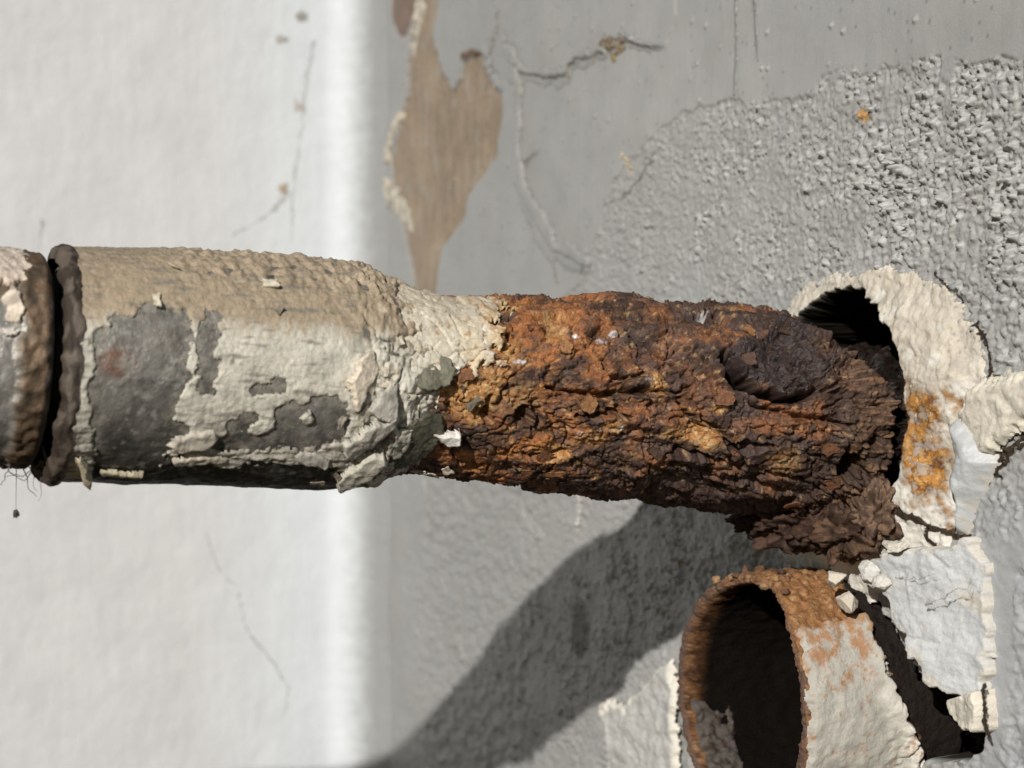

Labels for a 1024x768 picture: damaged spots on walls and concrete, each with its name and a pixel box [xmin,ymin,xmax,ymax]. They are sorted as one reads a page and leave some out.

peeling [383,0,503,294]
crack [487,7,662,284]
peeling [261,278,280,287]
peeling [295,351,461,494]
peeling [417,355,482,412]
rust [578,393,598,414]
rust [713,388,735,406]
peeling [74,457,144,490]
peeling [166,429,228,467]
rust [520,470,566,480]
rust [902,381,963,528]
rust [759,568,791,596]